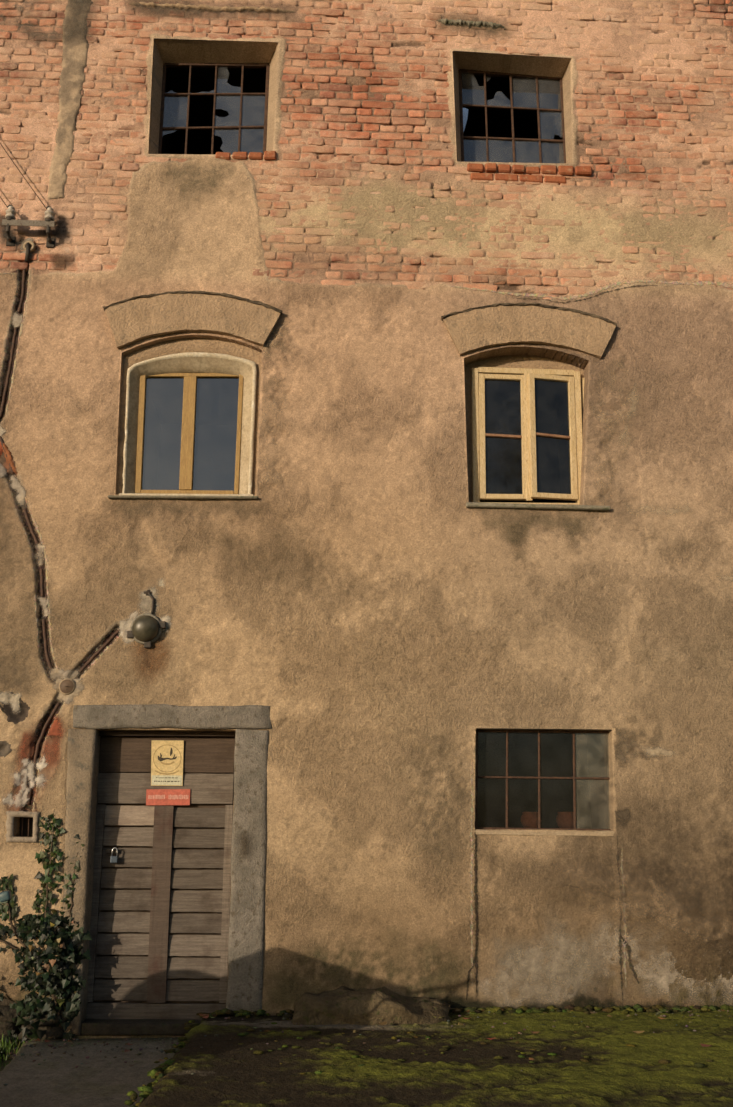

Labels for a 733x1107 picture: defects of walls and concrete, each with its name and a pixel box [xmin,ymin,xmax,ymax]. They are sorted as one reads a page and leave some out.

spalling [0,442,18,478]
flaking render [0,692,62,812]
crack [466,734,479,1000]
crack [617,836,639,1001]